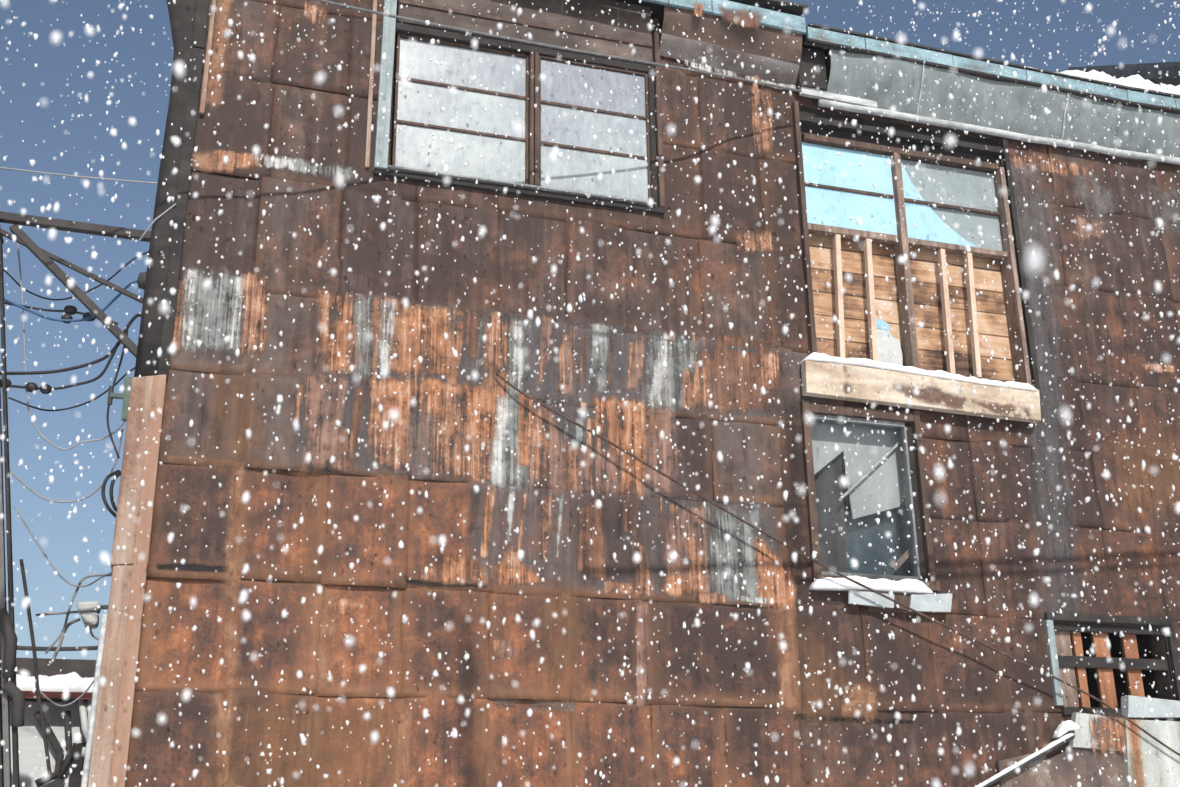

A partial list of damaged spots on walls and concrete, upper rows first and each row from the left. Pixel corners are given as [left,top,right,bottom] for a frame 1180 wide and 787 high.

corrosion [304,0,326,24]
corrosion [192,154,218,170]
corrosion [1011,156,1088,177]
corrosion [1076,217,1104,238]
peeling [171,269,268,354]
peeling [466,312,532,488]
peeling [627,334,698,410]
corrosion [1140,363,1174,372]
corrosion [294,291,779,708]
peeling [698,508,795,608]
corrosion [215,622,237,787]
corrosion [1089,715,1127,752]